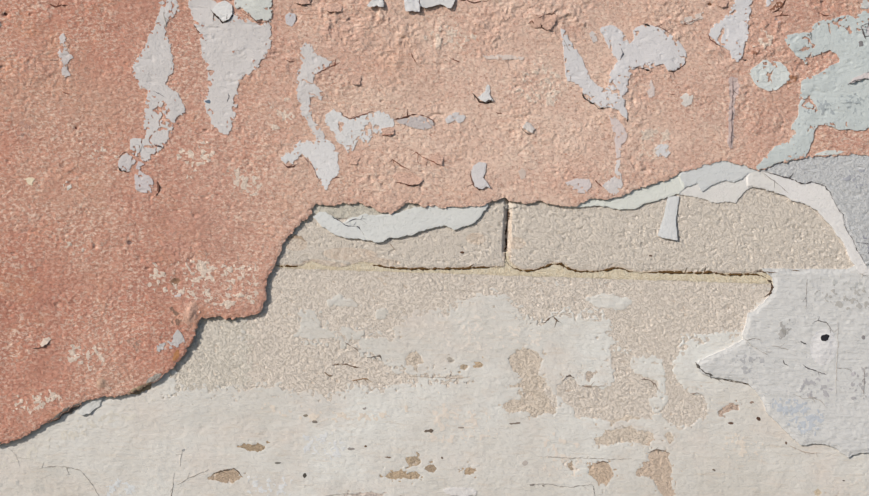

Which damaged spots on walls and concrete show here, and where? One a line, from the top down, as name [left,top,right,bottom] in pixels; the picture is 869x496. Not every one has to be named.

peeling [58,33,73,77]
peeling [118,0,272,193]
peeling [281,42,434,190]
peeling [404,0,455,12]
peeling [530,14,687,195]
peeling [709,0,753,62]
peeling [750,0,869,269]
peeling [47,398,103,423]
spalling [128,382,152,395]
peeling [157,187,869,496]
crack [540,449,670,464]
crack [357,210,865,395]